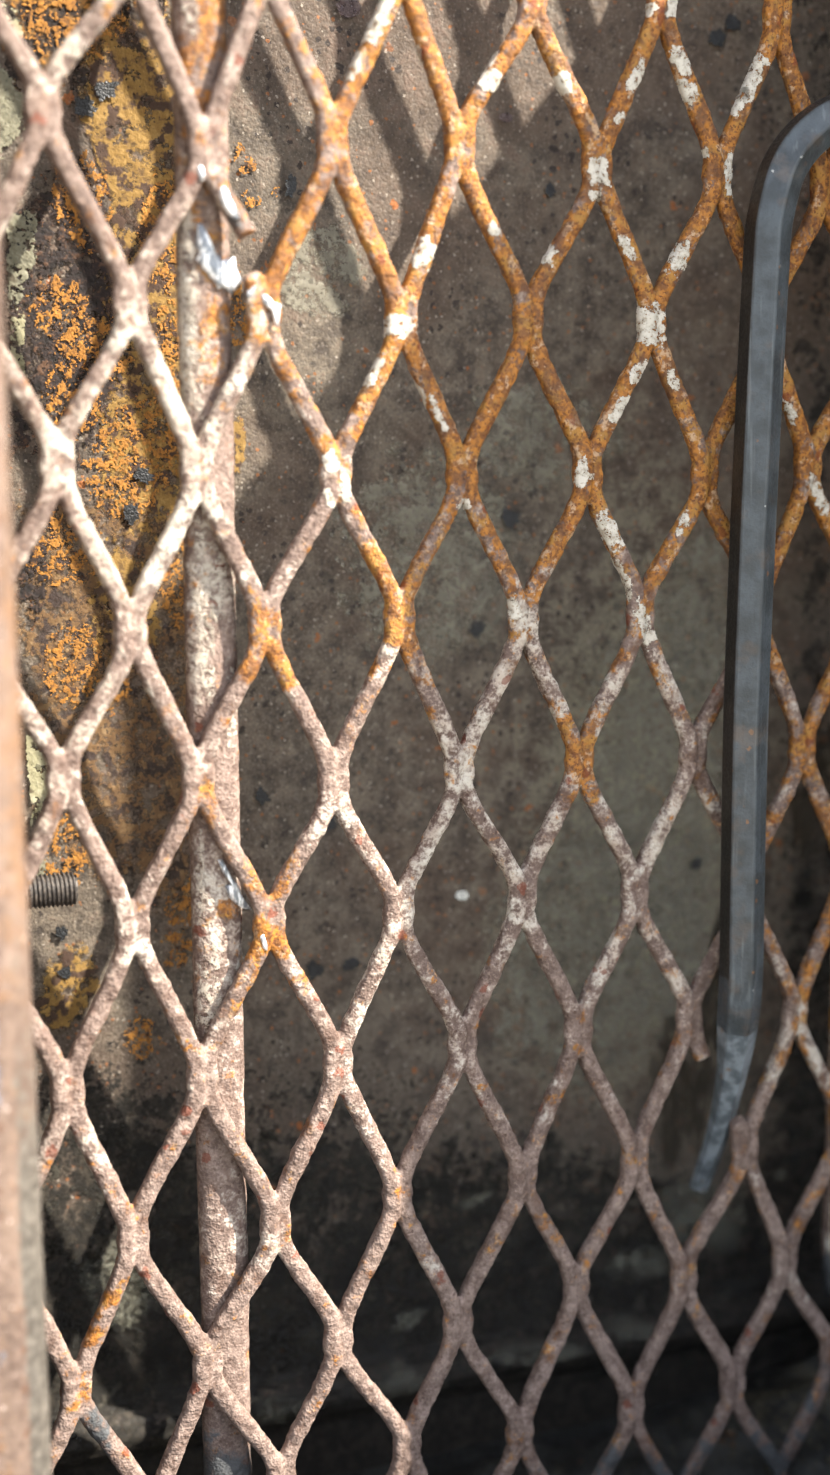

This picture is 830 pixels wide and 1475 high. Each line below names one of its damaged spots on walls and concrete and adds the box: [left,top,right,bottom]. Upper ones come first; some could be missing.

corrosion [0,46,24,92]
corrosion [1,0,95,71]
corrosion [60,0,175,267]
corrosion [4,168,115,428]
corrosion [146,231,180,397]
corrosion [7,408,39,463]
corrosion [74,339,181,598]
corrosion [16,504,114,748]
corrosion [146,541,187,727]
corrosion [41,810,100,886]
corrosion [80,664,193,969]
corrosion [34,939,100,1032]